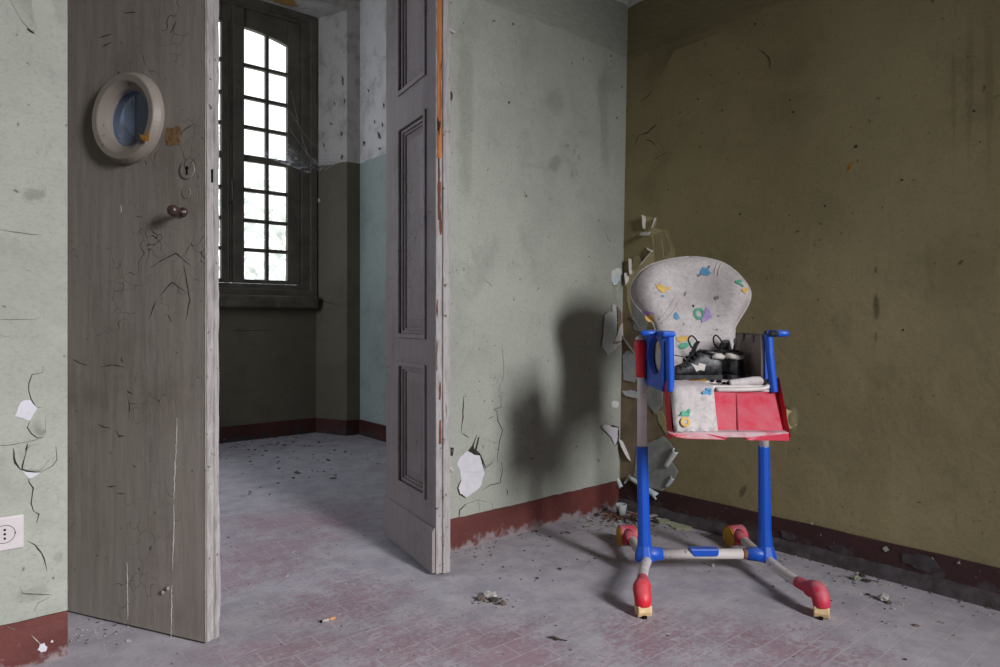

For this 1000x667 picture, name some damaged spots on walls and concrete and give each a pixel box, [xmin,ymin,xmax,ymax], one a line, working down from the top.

peeling [13,372,57,523]
peeling [457,435,503,516]
crack [489,351,504,463]
peeling [601,215,679,500]